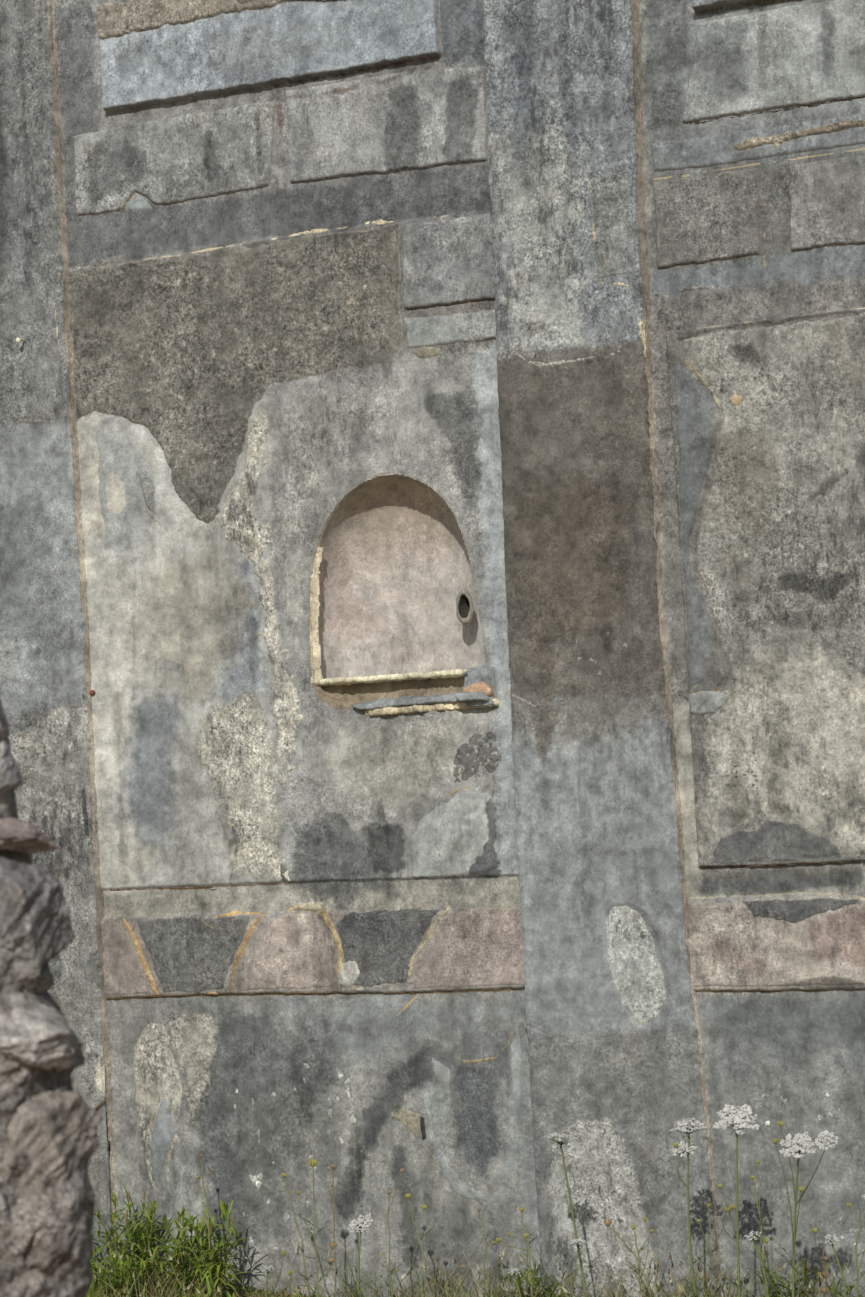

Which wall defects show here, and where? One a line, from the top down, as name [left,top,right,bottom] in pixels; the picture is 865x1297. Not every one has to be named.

peeling [52,219,441,881]
peeling [605,906,667,1025]